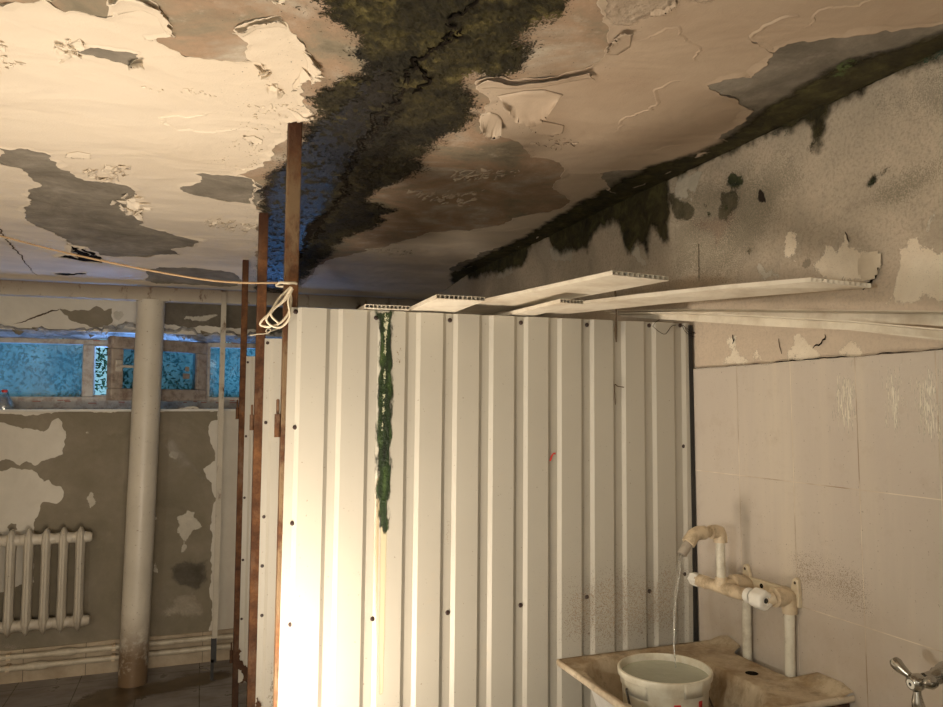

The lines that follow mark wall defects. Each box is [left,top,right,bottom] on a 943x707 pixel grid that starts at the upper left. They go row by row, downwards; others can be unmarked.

crack [0,229,37,275]
peeling [0,0,373,287]
damp [241,154,287,294]
damp [296,0,570,285]
peeling [298,0,617,292]
damp [447,32,943,289]
crack [693,335,943,369]
peeling [702,21,943,141]
peeling [0,412,131,651]
peeling [150,406,218,636]
damp [70,670,232,707]
corrosion [232,648,247,683]